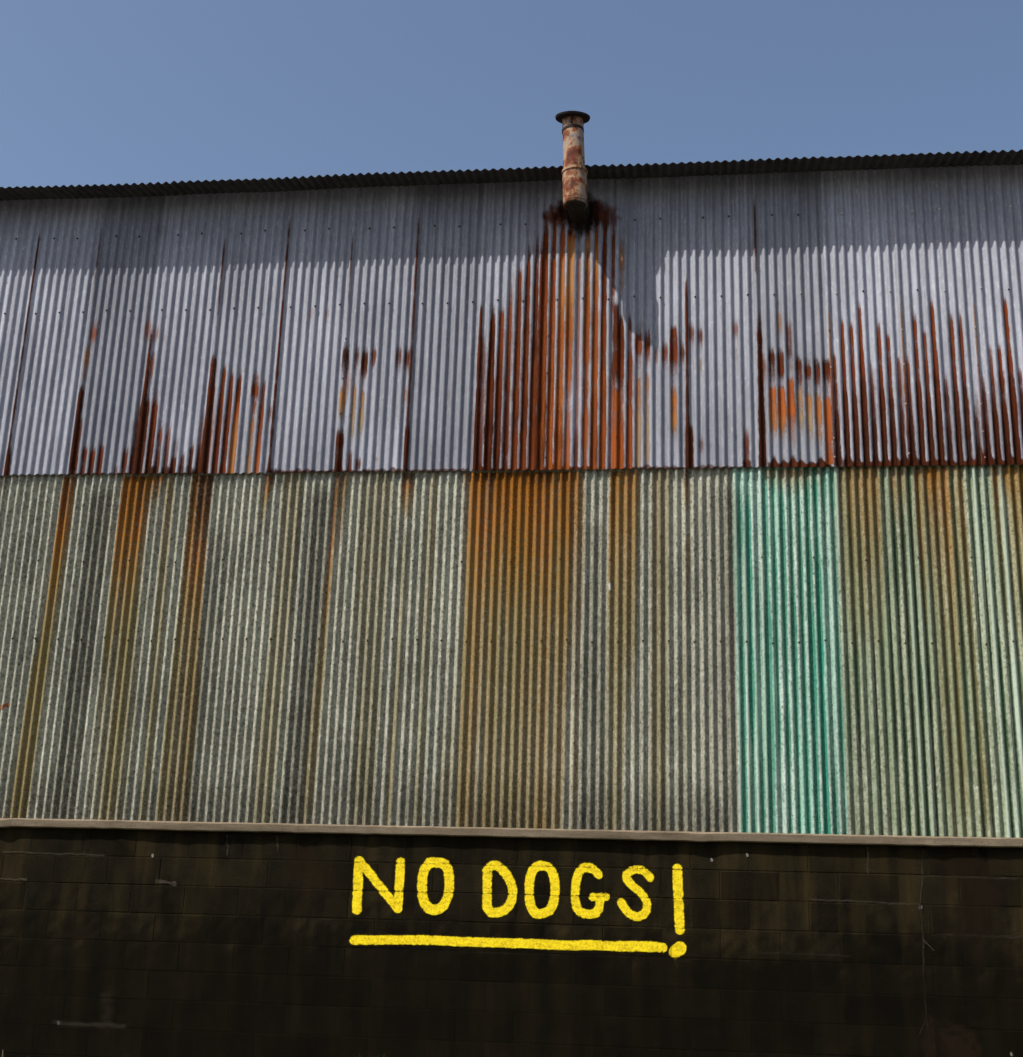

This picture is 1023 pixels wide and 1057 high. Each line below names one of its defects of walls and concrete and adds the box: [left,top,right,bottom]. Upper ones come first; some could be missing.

rust [100,199,703,827]
rust [743,299,1023,668]